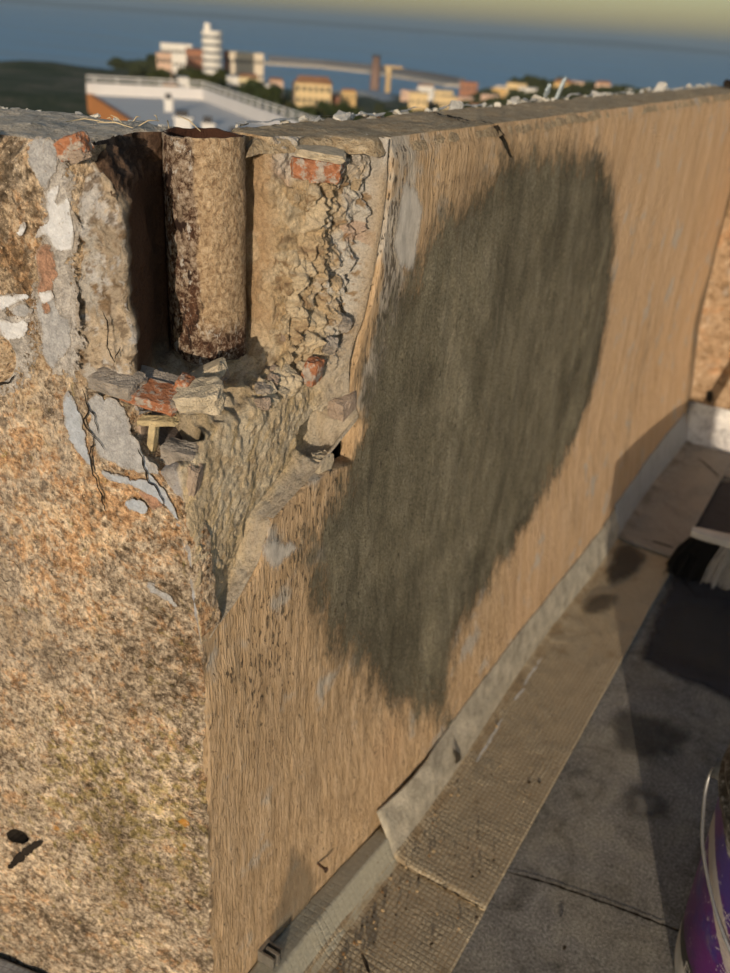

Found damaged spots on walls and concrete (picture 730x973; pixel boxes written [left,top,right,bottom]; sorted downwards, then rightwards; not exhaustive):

crack [426,111,495,125]
crack [102,311,121,363]
spalling [0,76,717,644]
crack [82,389,106,511]
crack [138,450,164,506]